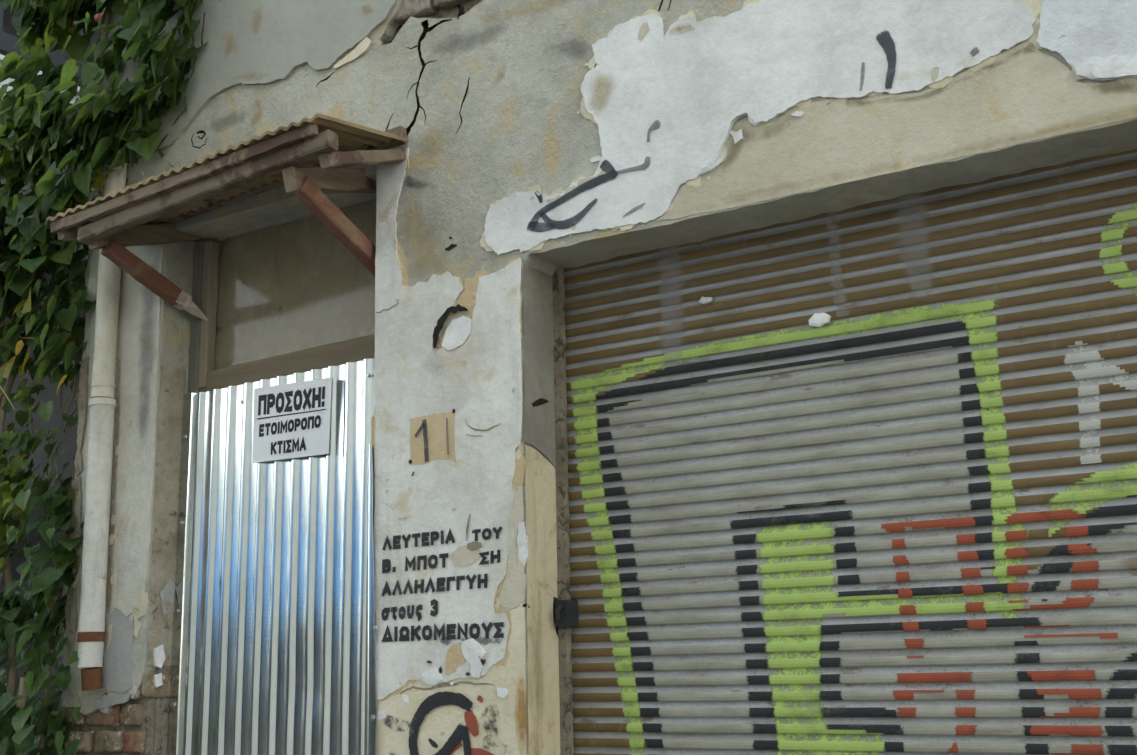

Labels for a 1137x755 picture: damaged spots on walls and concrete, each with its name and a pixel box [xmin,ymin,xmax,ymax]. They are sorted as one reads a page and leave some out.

peeling [105,0,483,158]
crack [386,4,465,136]
peeling [125,244,166,274]
peeling [371,0,1137,755]
peeling [63,249,186,755]